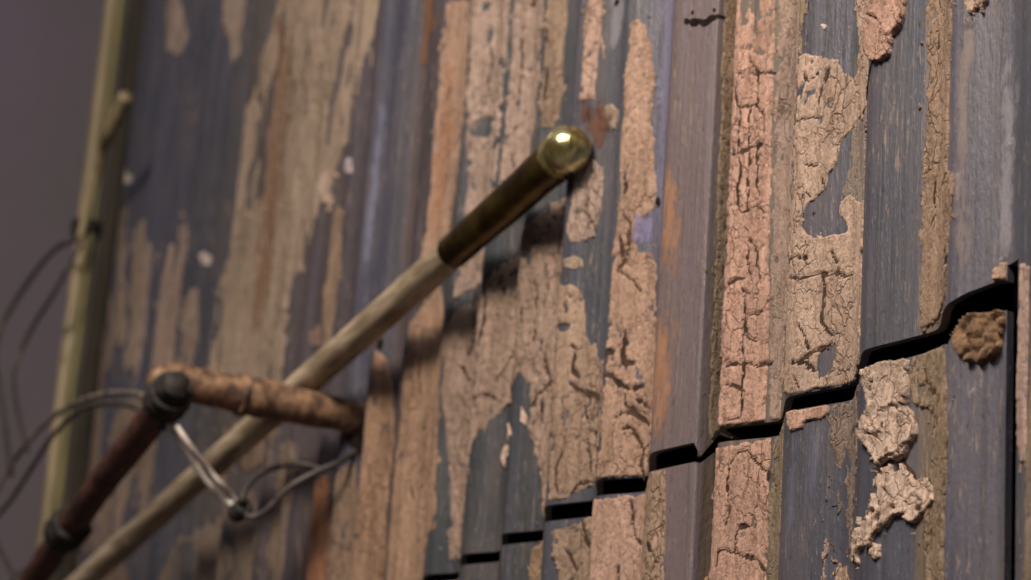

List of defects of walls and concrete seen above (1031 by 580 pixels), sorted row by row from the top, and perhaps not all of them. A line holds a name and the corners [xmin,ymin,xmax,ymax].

peeling [77,434,161,569]
peeling [87,0,379,479]
peeling [155,0,666,580]
crack [429,57,1018,580]
peeling [702,0,1031,580]